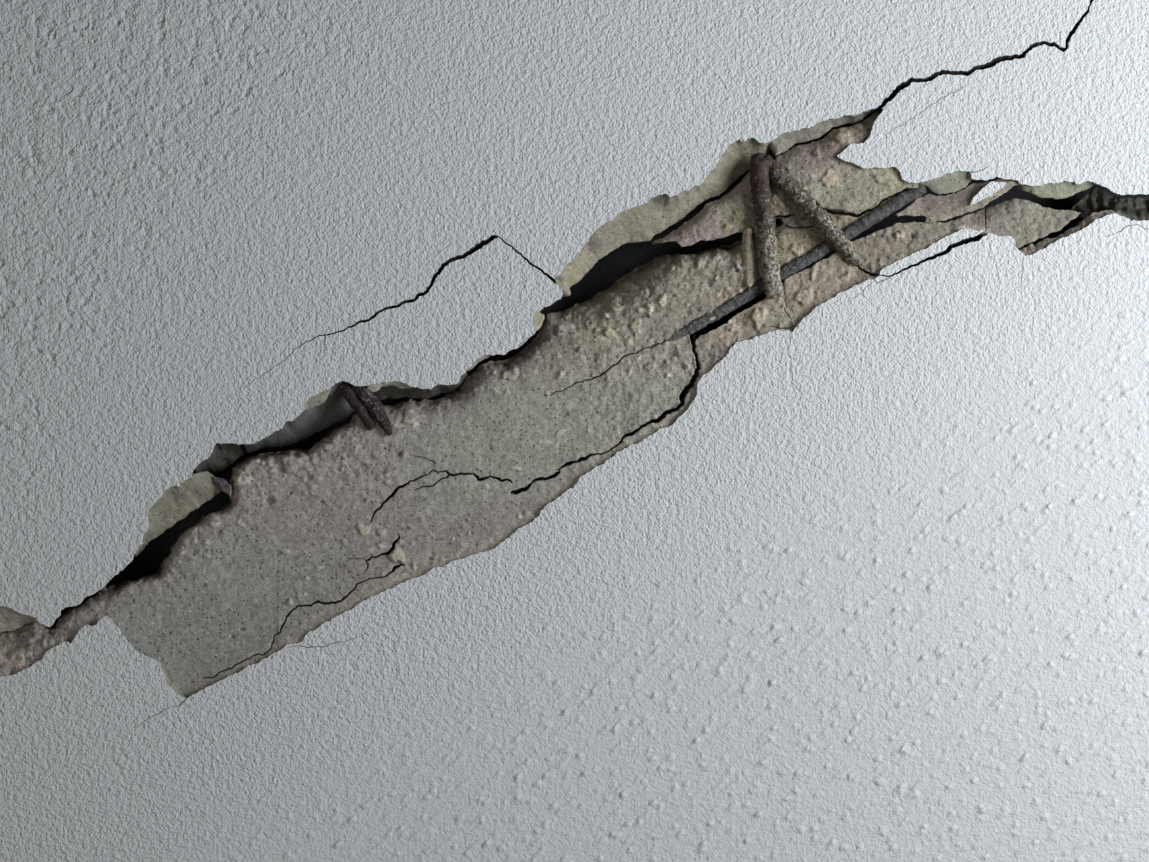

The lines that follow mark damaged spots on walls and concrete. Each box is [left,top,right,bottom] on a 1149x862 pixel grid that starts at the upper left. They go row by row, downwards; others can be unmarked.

crack [875,0,1094,134]
crack [245,235,556,388]
crack [770,283,803,395]
crack [816,189,905,220]
crack [847,230,988,303]
crack [1070,187,1149,237]
spalling [0,108,1121,699]